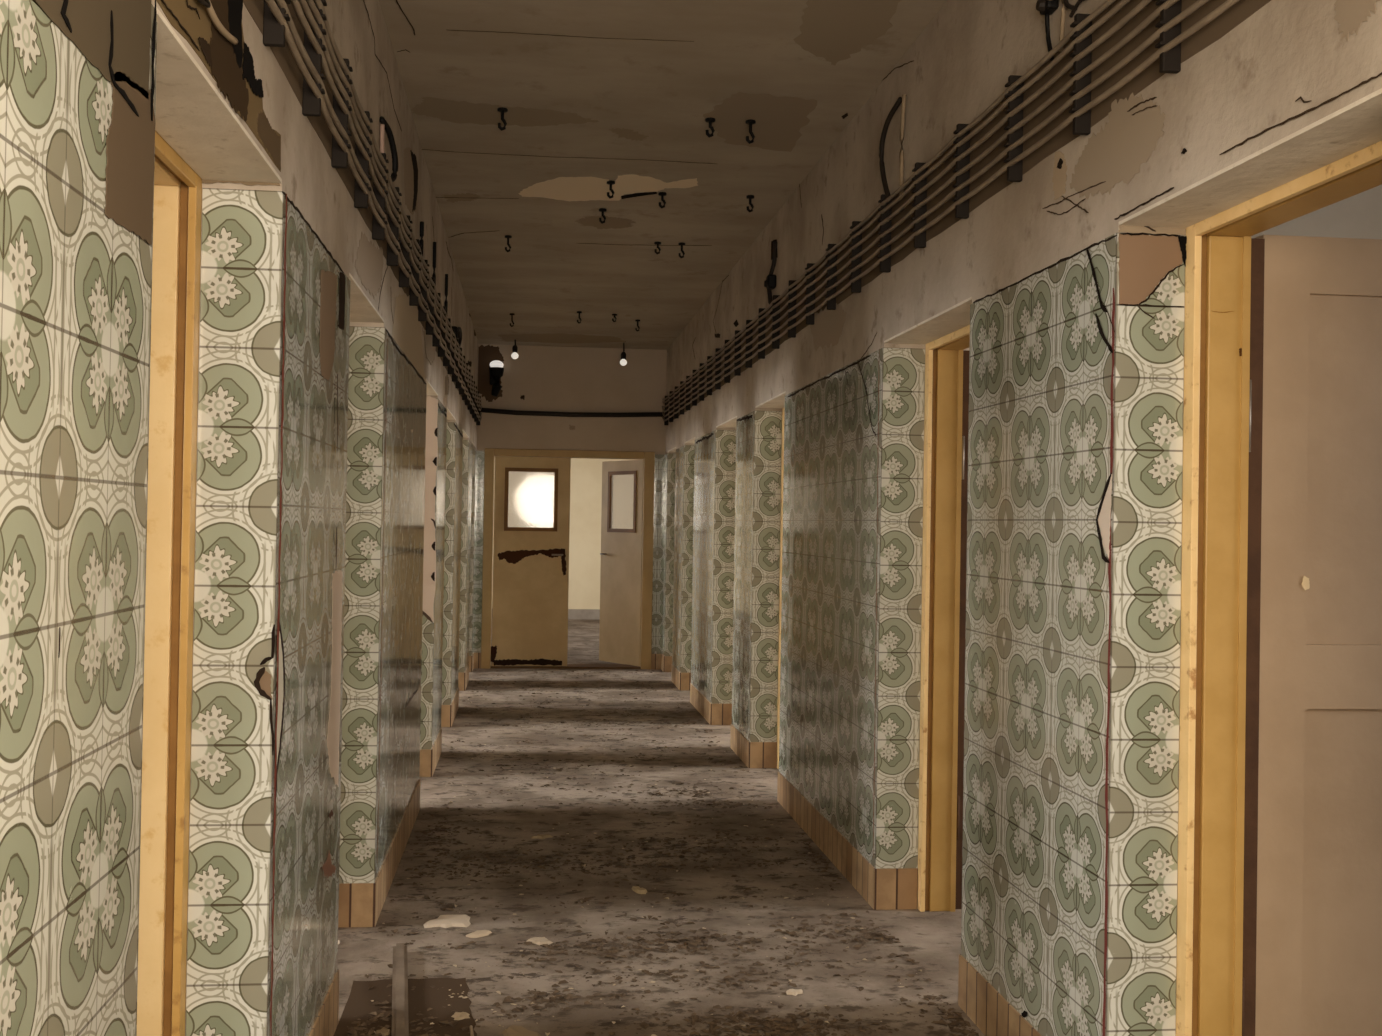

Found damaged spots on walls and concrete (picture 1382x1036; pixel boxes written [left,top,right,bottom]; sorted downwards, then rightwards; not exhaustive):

crack [61,0,72,33]
damp [793,0,902,65]
peeling [34,0,281,245]
peeling [518,174,698,201]
peeling [1118,225,1187,305]
peeling [320,270,346,380]
crack [254,621,285,796]